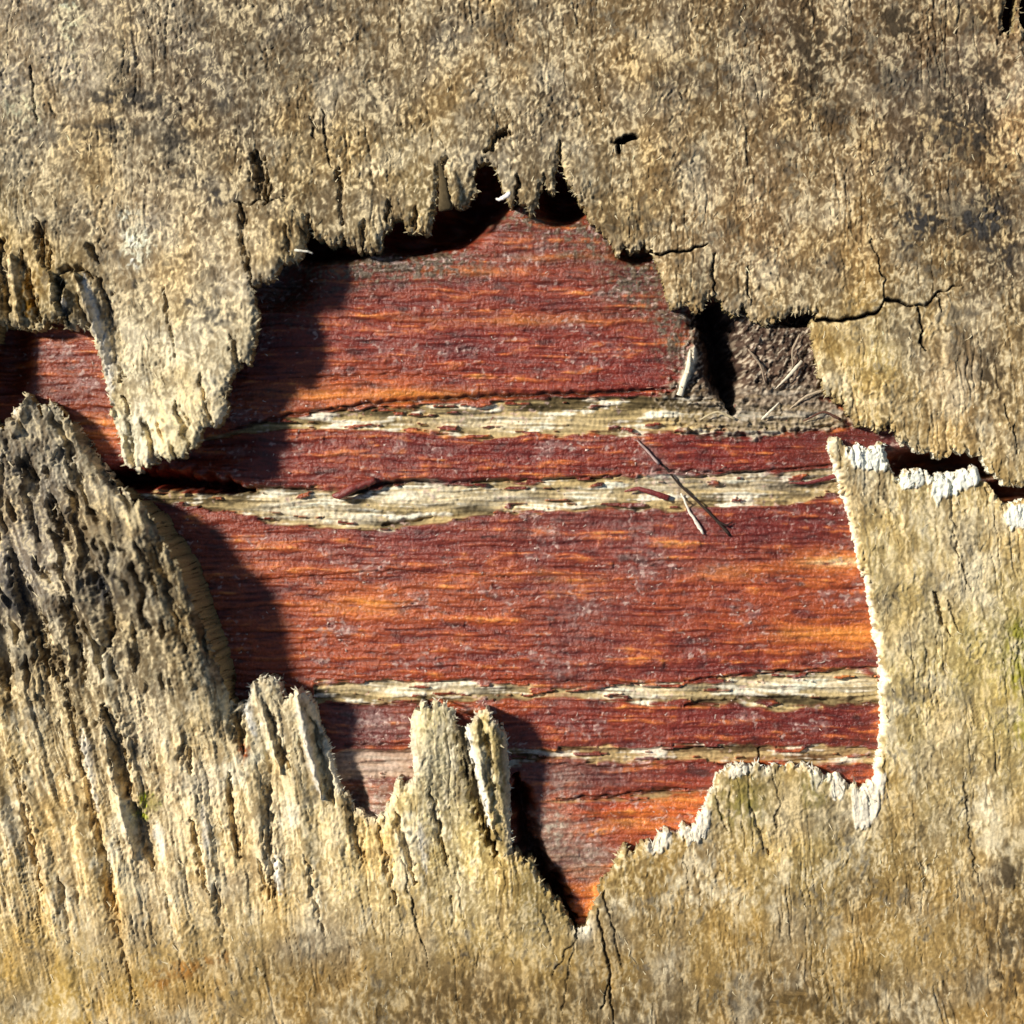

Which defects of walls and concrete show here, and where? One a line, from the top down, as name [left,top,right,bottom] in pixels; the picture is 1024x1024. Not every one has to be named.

crack [655,243,708,256]
crack [814,298,926,351]
peeling [0,166,1024,928]